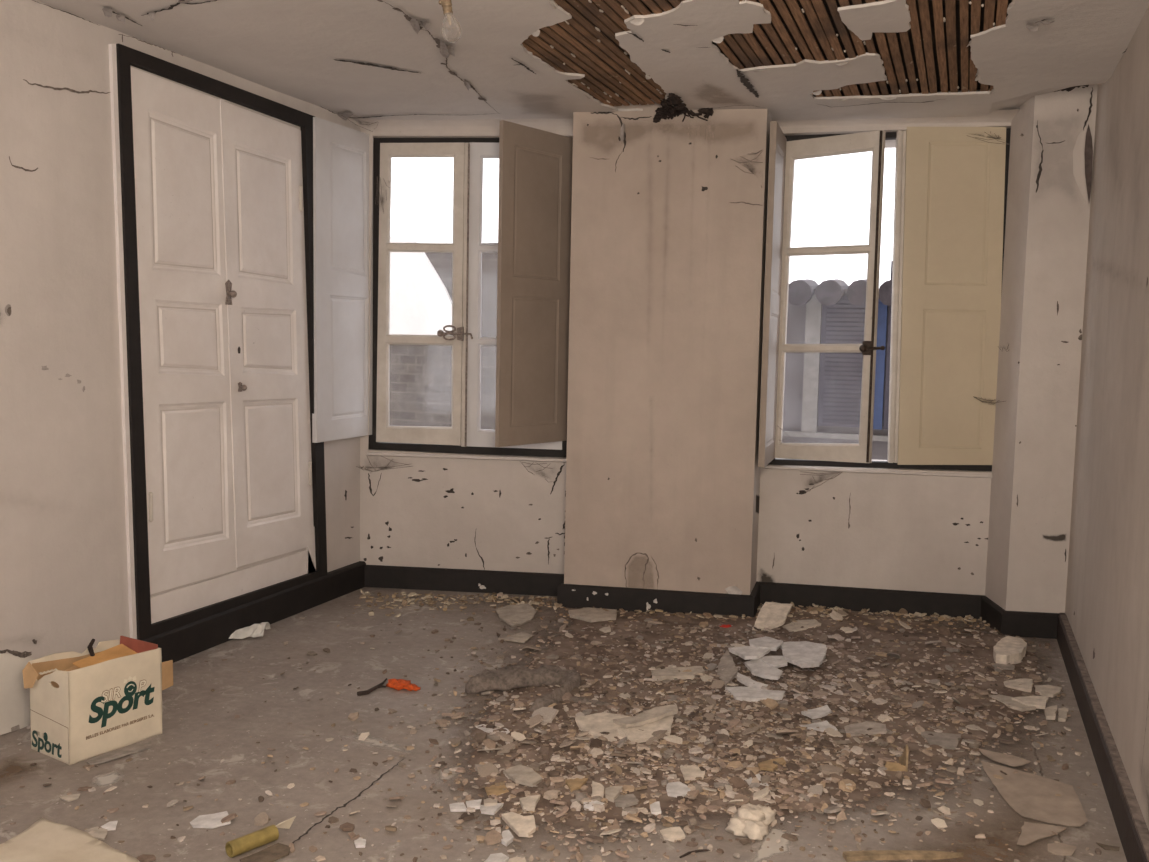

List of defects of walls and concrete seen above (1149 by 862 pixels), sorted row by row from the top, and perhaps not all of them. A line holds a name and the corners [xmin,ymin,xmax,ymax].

crack [334,0,498,115]
crack [9,156,38,172]
crack [322,107,435,120]
crack [591,112,652,172]
crack [1036,120,1064,192]
peeling [625,553,659,610]
peeling [0,649,32,658]
crack [292,758,405,843]